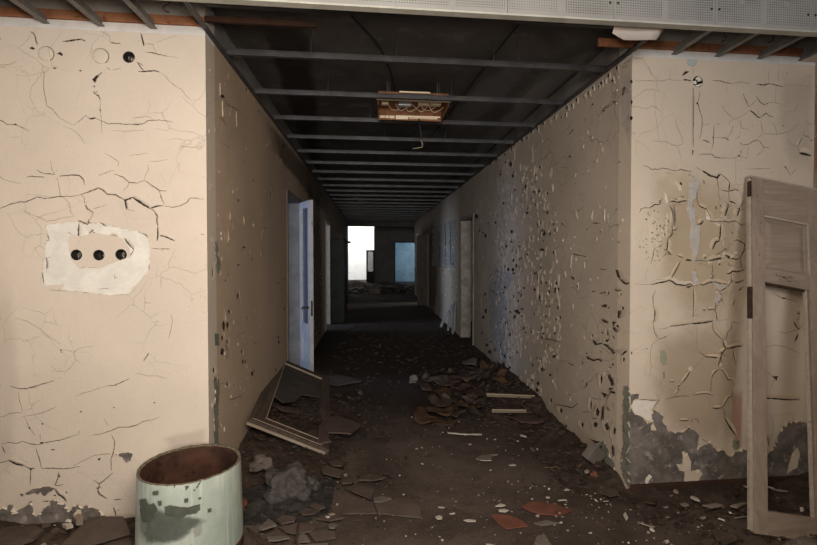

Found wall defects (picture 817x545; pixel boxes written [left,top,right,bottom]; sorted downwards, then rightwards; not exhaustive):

crack [62,31,121,44]
crack [42,33,191,143]
crack [0,153,204,291]
peeling [212,228,234,278]
spalling [475,63,747,489]
crack [514,66,817,457]
crack [0,318,156,516]
spalling [767,420,809,477]